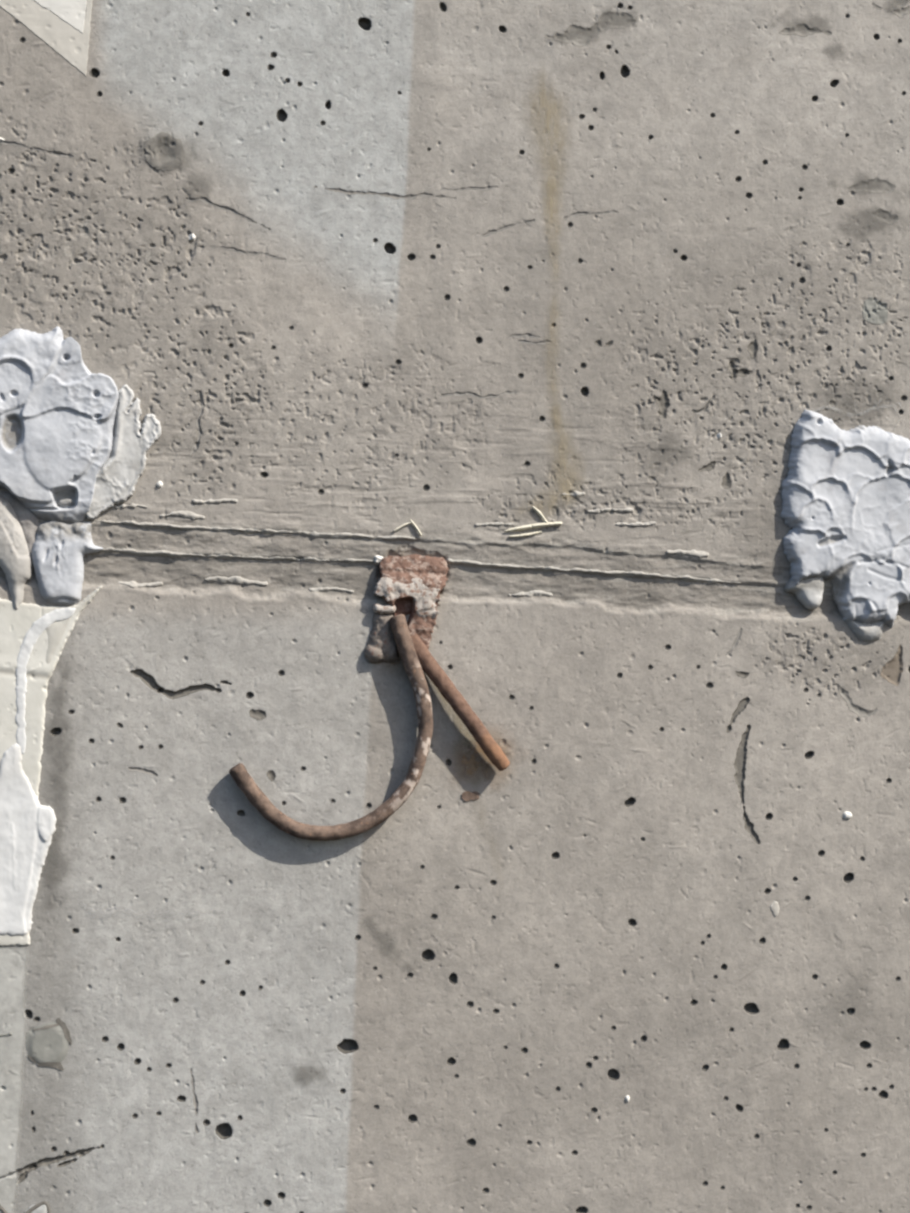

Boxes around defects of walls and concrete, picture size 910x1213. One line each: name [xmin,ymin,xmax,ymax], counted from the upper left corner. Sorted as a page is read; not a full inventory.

crack [130,669,231,699]
corrosion [457,722,491,776]
crack [726,697,760,844]
corrosion [462,791,479,801]
peeling [24,1201,51,1213]